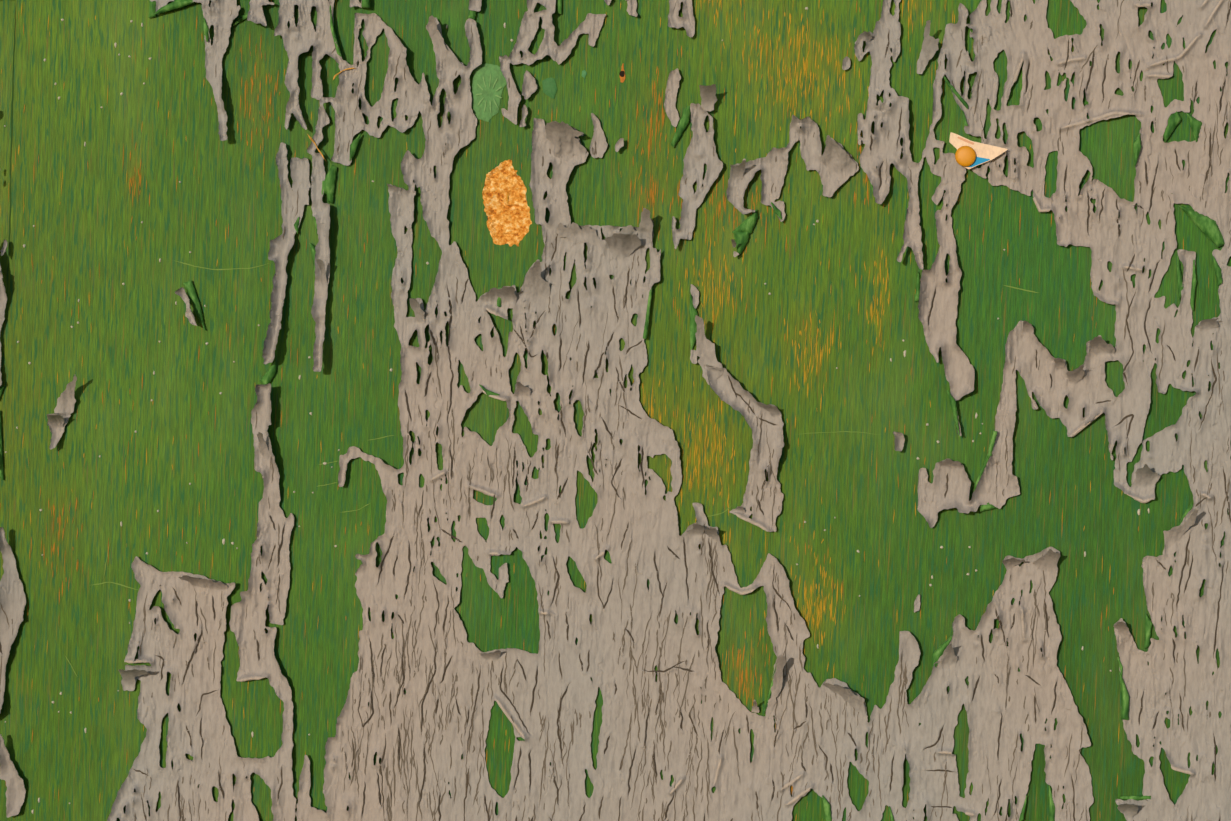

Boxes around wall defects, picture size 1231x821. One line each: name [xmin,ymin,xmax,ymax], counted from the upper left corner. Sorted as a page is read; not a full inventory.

peeling [262,19,408,372]
peeling [387,184,452,384]
peeling [426,16,482,128]
peeling [457,113,654,529]
peeling [690,284,784,532]
peeling [983,50,1058,198]
peeling [997,0,1231,350]
peeling [1126,328,1211,493]
peeling [0,527,26,713]
peeling [428,490,540,663]
peeling [715,586,786,732]
peeling [952,704,1066,821]